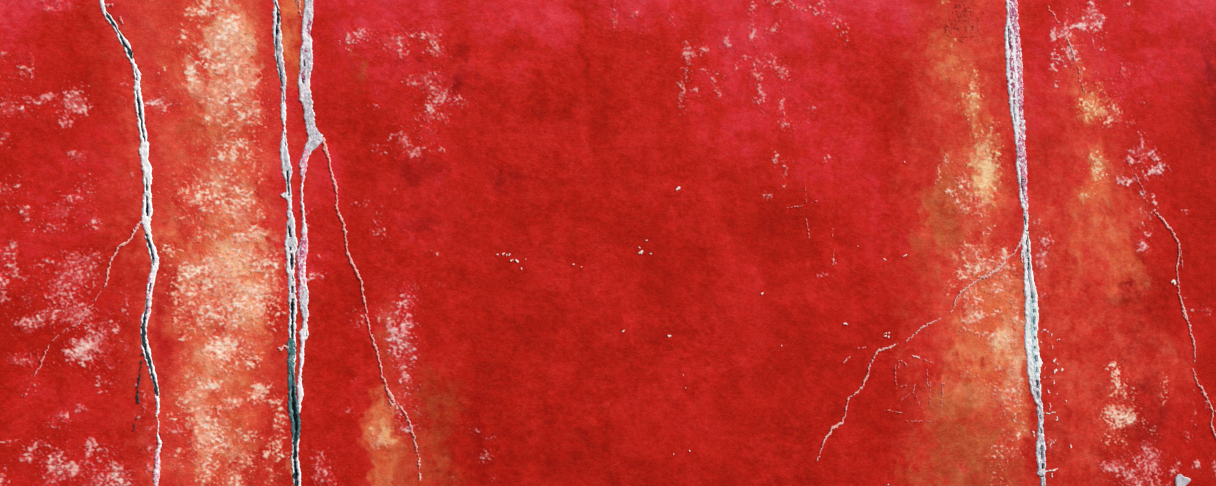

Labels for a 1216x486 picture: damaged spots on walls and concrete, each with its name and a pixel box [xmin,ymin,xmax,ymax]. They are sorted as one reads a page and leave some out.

crack [25,0,162,486]
rust [73,0,338,486]
crack [272,0,421,486]
crack [816,0,1058,486]
rust [878,0,1205,486]
crack [1049,7,1086,94]
peeling [1084,357,1216,486]
crack [1126,157,1216,437]